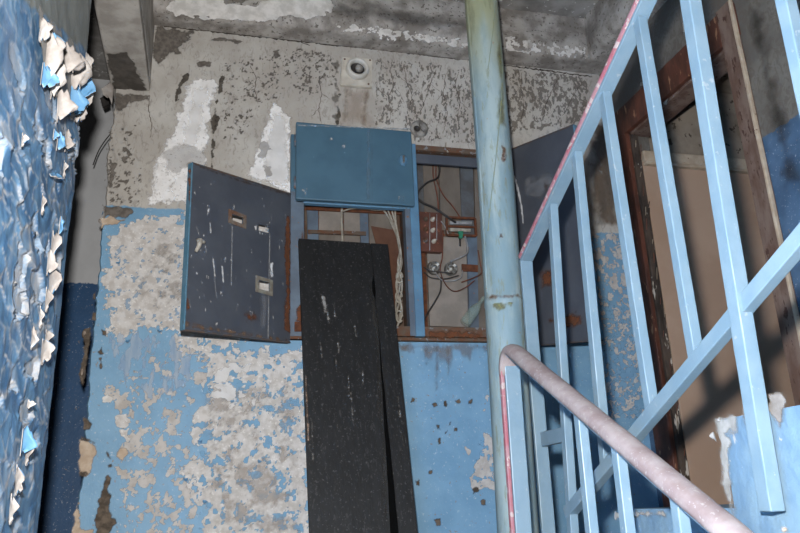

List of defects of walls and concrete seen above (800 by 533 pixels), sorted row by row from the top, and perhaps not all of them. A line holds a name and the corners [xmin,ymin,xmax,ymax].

peeling [166,0,334,22]
peeling [336,23,468,48]
peeling [39,6,96,179]
peeling [31,216,65,365]
peeling [72,125,309,533]
peeling [591,229,644,420]
spalling [768,393,786,424]
peeling [8,426,38,525]
peeling [464,432,495,505]
spalling [709,416,745,504]